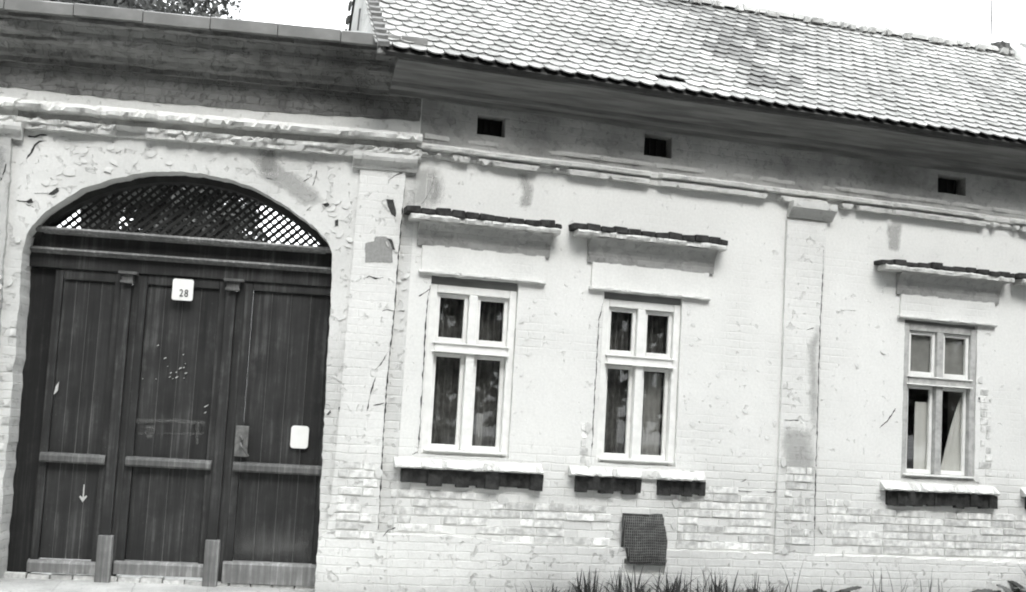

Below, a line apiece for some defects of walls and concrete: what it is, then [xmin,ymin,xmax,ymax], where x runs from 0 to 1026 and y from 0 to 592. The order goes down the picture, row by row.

flaking render [42,145,88,196]